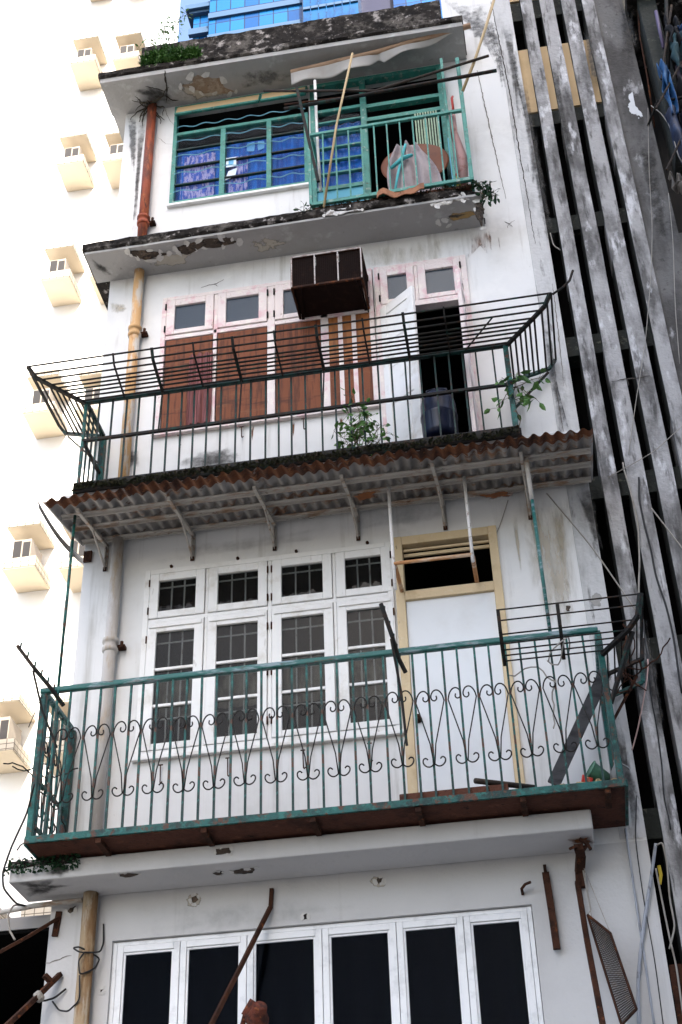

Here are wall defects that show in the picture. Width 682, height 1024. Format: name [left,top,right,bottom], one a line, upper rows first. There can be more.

spalling [178,72,237,99]
leakage [460,11,549,220]
leakage [129,122,143,215]
spalling [430,192,487,230]
spalling [124,234,243,266]
leakage [193,451,232,466]
spalling [186,893,201,907]